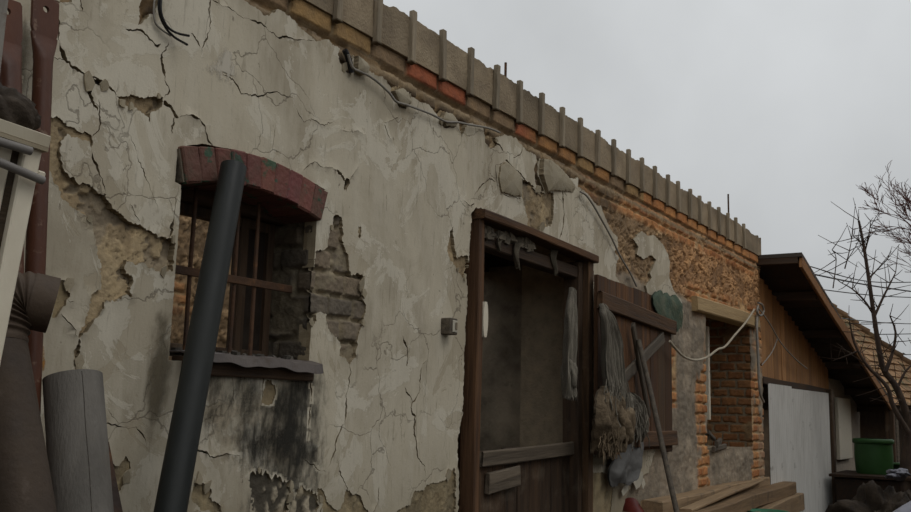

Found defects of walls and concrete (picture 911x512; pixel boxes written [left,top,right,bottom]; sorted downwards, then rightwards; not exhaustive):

flaking render [136,0,153,31]
spalling [118,93,162,116]
spalling [49,117,175,334]
flaking render [245,0,765,512]
peeling [191,471,225,512]